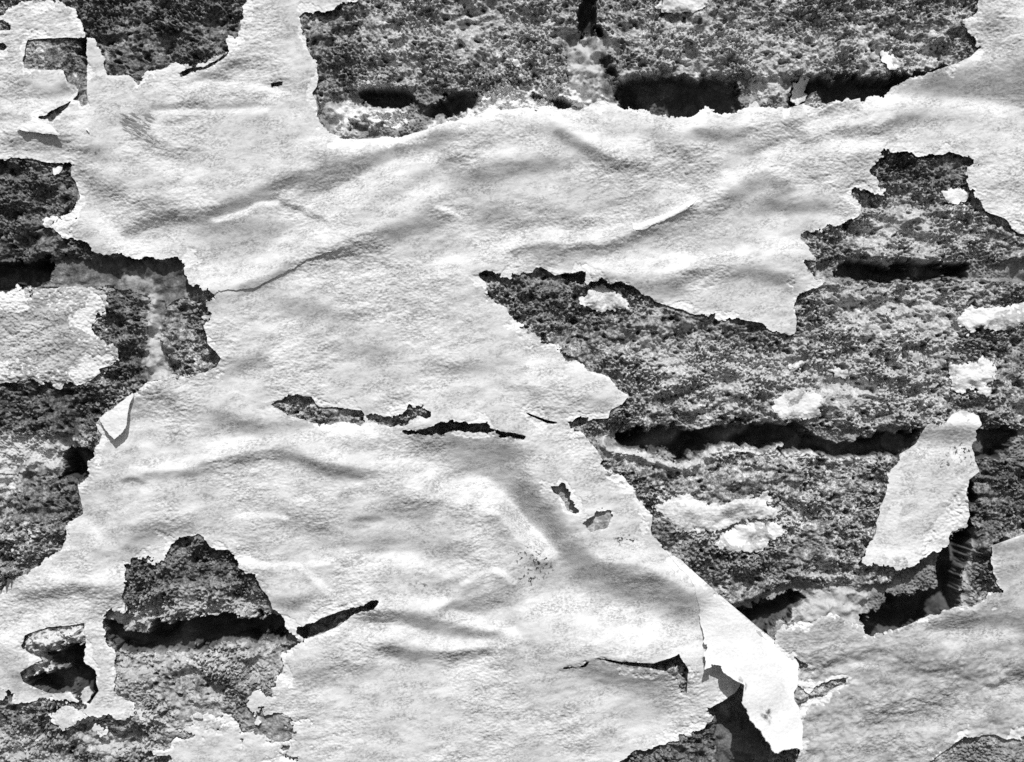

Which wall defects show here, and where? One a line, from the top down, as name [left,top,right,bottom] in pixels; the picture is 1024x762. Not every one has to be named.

spalling [0,0,247,122]
spalling [299,0,981,131]
spalling [0,157,147,261]
spalling [0,285,151,448]
spalling [161,288,221,380]
spalling [479,148,1024,607]
spalling [0,471,83,590]
spalling [0,534,307,762]
spalling [620,706,717,762]
spalling [761,733,800,762]
spalling [794,678,846,707]